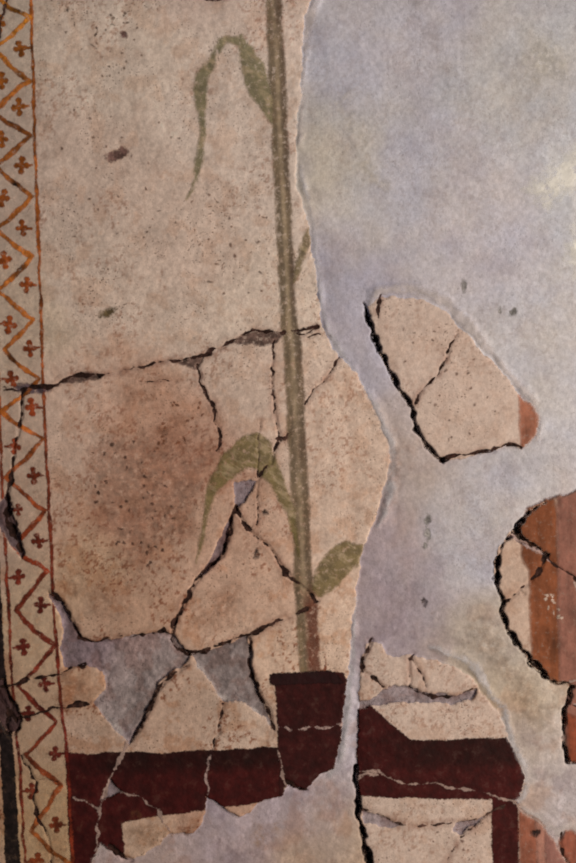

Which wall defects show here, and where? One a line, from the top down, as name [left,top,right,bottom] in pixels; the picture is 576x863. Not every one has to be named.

crack [375,294,383,318]
crack [414,339,455,405]
crack [439,442,523,463]
crack [0,324,321,742]
crack [503,551,576,603]
spalling [48,594,271,744]
crack [360,637,385,688]
spalling [359,685,477,709]
crack [408,654,477,699]
crack [21,755,58,834]
spalling [362,811,399,828]
spalling [453,817,483,860]